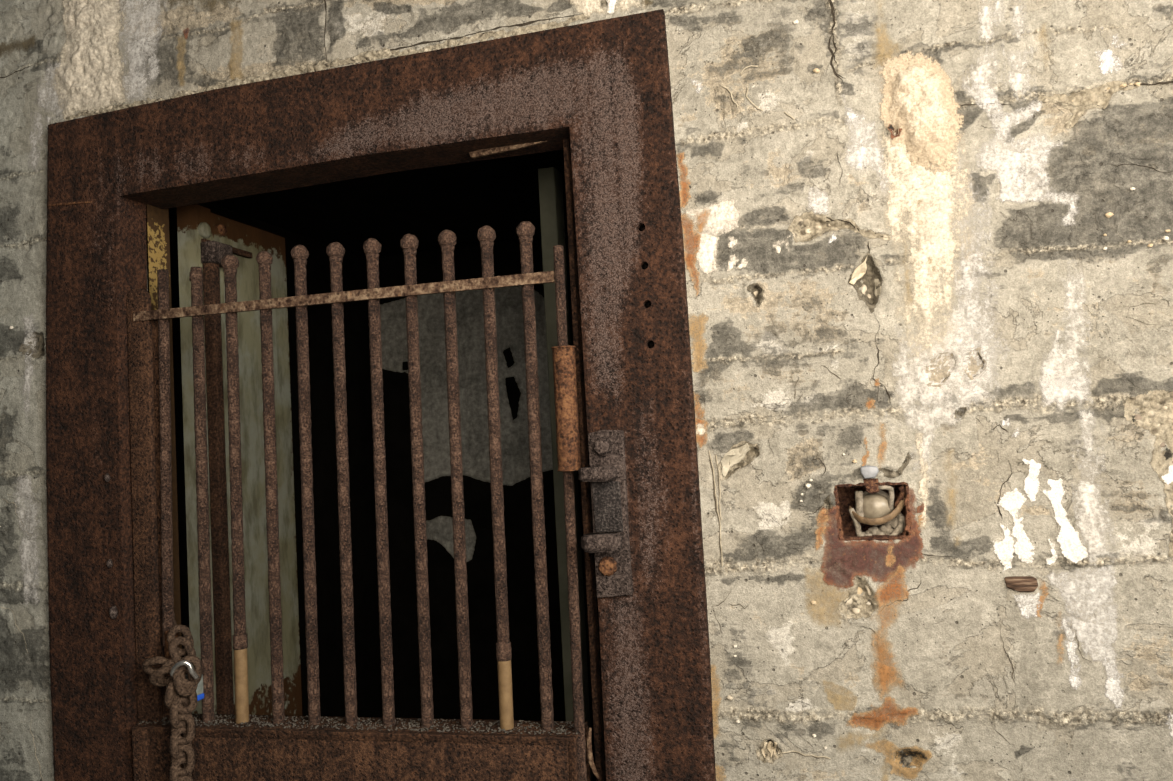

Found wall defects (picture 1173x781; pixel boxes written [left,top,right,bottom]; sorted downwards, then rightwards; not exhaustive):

crack [828,0,844,84]
corrosion [677,152,710,296]
spalling [787,211,891,313]
corrosion [689,314,708,372]
corrosion [693,392,708,448]
spalling [1124,390,1173,557]
corrosion [809,488,932,780]